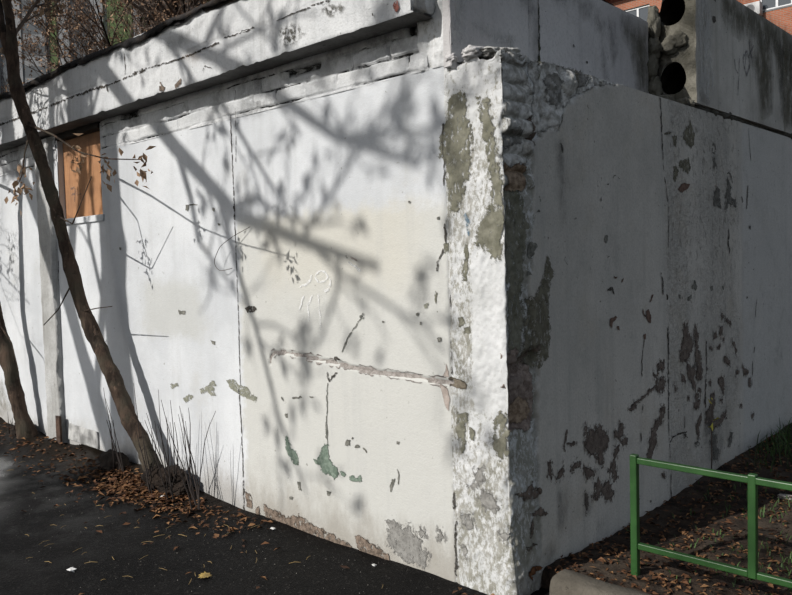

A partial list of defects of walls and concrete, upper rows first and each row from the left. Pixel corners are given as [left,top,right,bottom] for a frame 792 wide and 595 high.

spalling [647,5,695,106]
damp [725,0,792,124]
peeling [183,380,216,402]
peeling [226,379,257,401]
peeling [285,436,299,465]
peeling [313,444,362,482]
peeling [245,491,446,571]
peeling [440,365,475,453]
peeling [466,465,502,514]
spalling [492,344,541,461]
peeling [547,420,628,514]
peeling [627,313,751,412]